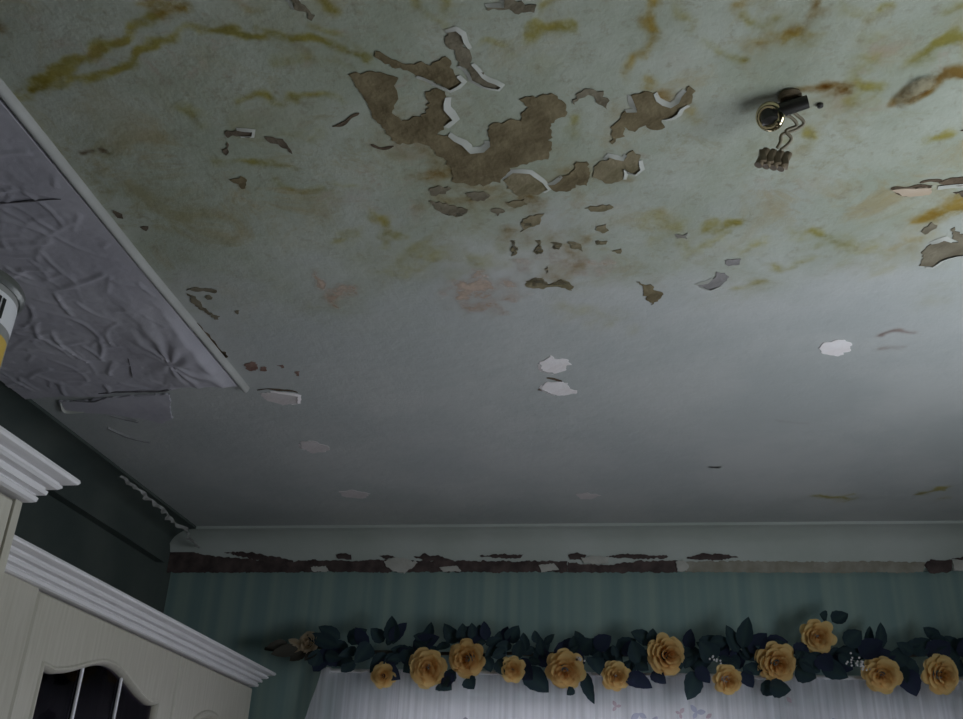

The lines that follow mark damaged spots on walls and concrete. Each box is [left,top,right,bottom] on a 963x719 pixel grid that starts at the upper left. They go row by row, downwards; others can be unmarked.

peeling [349,26,695,256]
crack [891,177,963,197]
peeling [919,222,963,269]
peeling [525,268,574,291]
peeling [638,282,663,305]
peeling [819,340,852,356]
peeling [537,355,577,396]
peeling [259,391,302,406]
peeling [167,551,963,574]